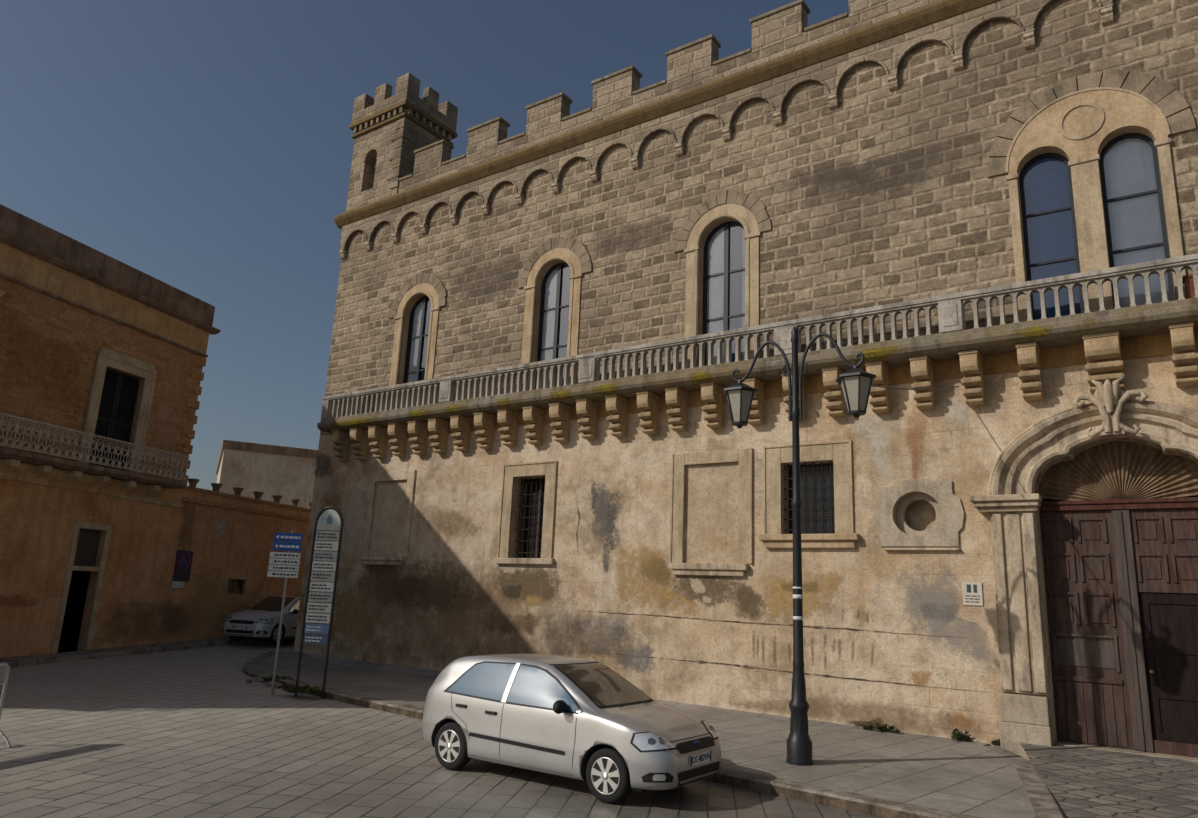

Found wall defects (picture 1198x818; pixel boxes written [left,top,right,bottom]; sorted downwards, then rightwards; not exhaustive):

water stain [591,484,696,614]
water stain [298,562,624,669]